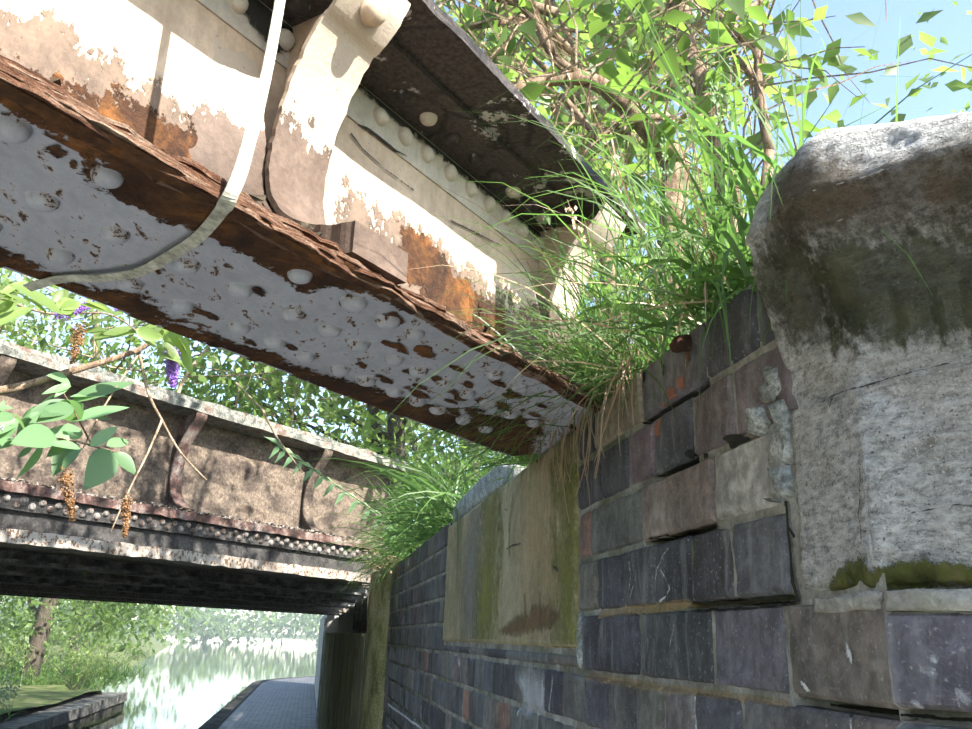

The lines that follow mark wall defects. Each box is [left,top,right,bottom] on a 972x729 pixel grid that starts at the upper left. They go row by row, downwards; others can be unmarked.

peeling [0,4,198,133]
corrosion [0,48,228,231]
damp [768,149,972,248]
corrosion [0,246,550,456]
corrosion [208,190,602,413]
crack [822,363,949,407]
damp [501,595,558,635]